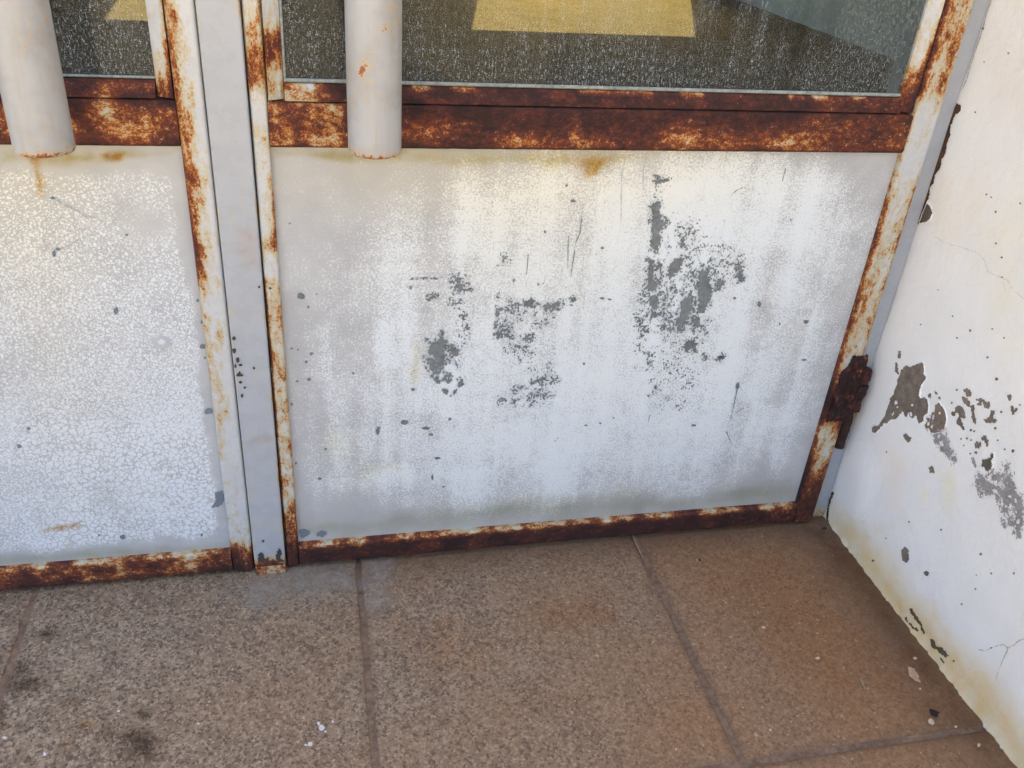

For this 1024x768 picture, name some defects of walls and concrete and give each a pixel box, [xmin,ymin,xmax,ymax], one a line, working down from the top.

peeling [401,267,477,397]
peeling [492,292,577,409]
peeling [632,173,747,416]
peeling [871,351,1024,539]